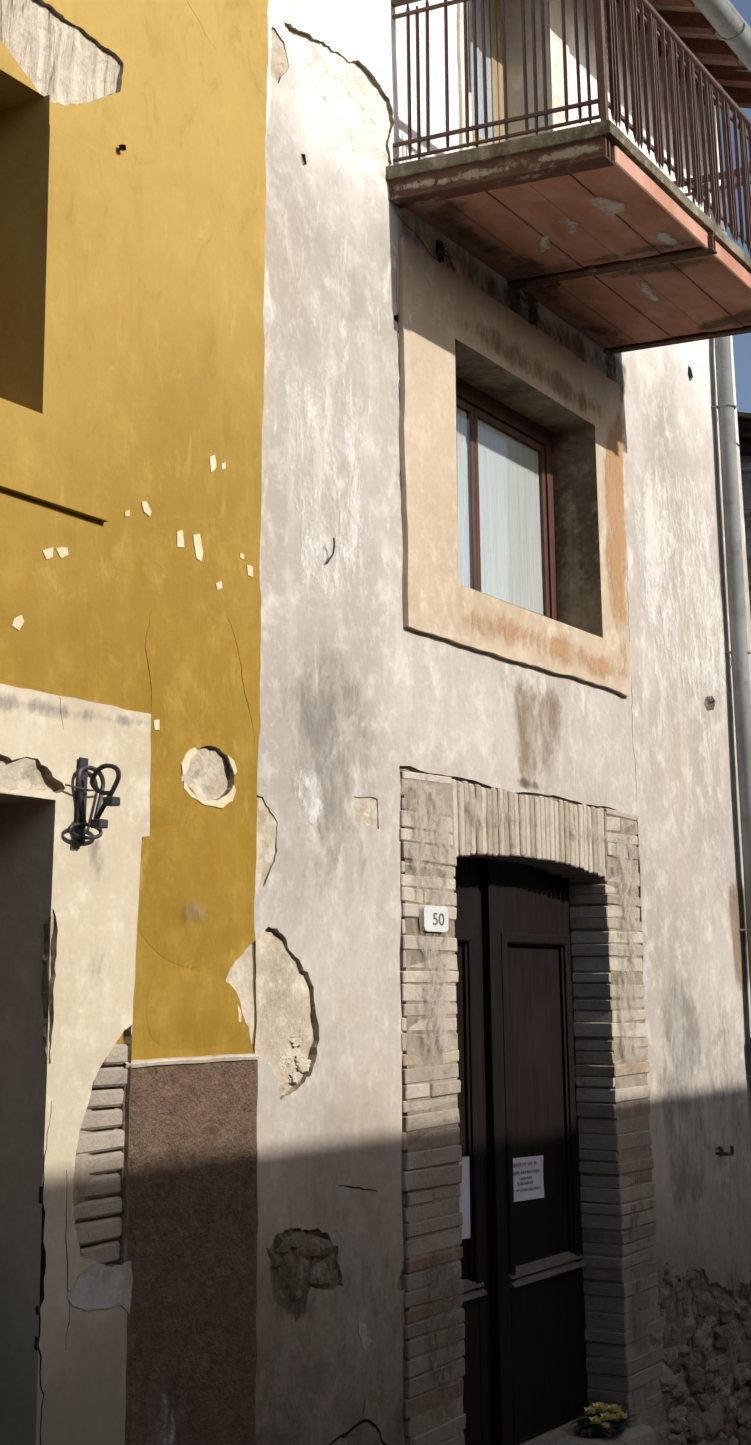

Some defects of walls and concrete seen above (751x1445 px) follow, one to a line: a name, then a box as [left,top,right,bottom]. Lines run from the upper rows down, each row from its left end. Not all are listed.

spalling [0,0,124,106]
spalling [270,22,394,200]
peeling [42,547,69,559]
peeling [177,530,203,562]
peeling [12,615,24,631]
spalling [0,754,66,793]
spalling [181,746,237,808]
spalling [256,795,278,887]
spalling [226,927,319,1100]
spalling [73,1025,132,1267]
spalling [266,1228,343,1324]
crack [329,1401,387,1445]